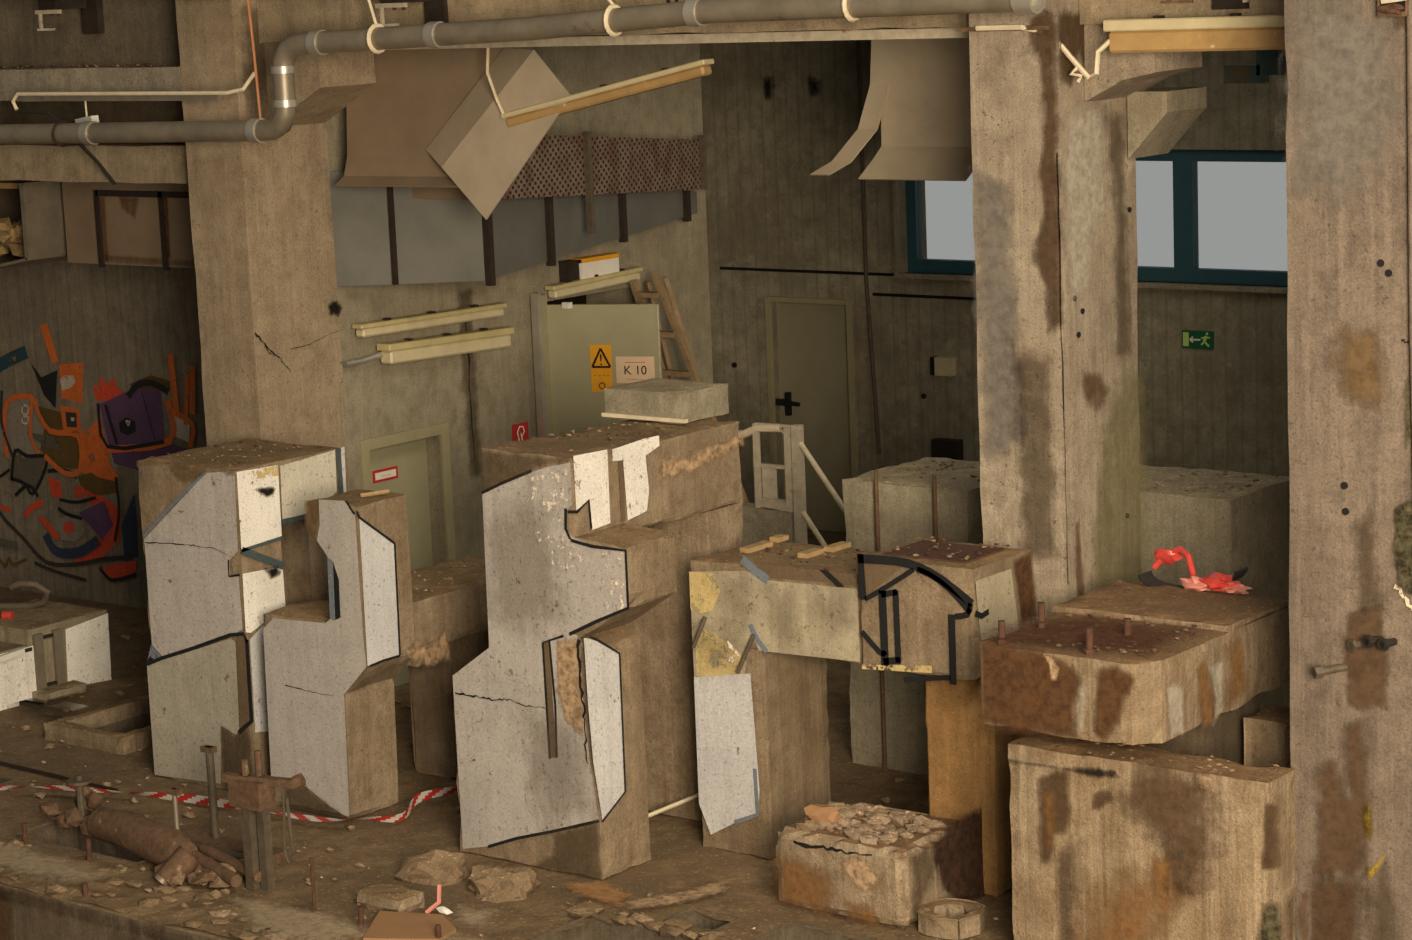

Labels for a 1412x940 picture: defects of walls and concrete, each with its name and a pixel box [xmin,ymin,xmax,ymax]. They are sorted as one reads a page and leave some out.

water stain [1031,13,1103,328]
crack [255,329,343,370]
water stain [977,178,1023,453]
rust [1085,376,1107,407]
water stain [1342,330,1381,402]
rust [882,540,1193,738]
water stain [1040,769,1116,861]
water stain [1298,609,1387,940]